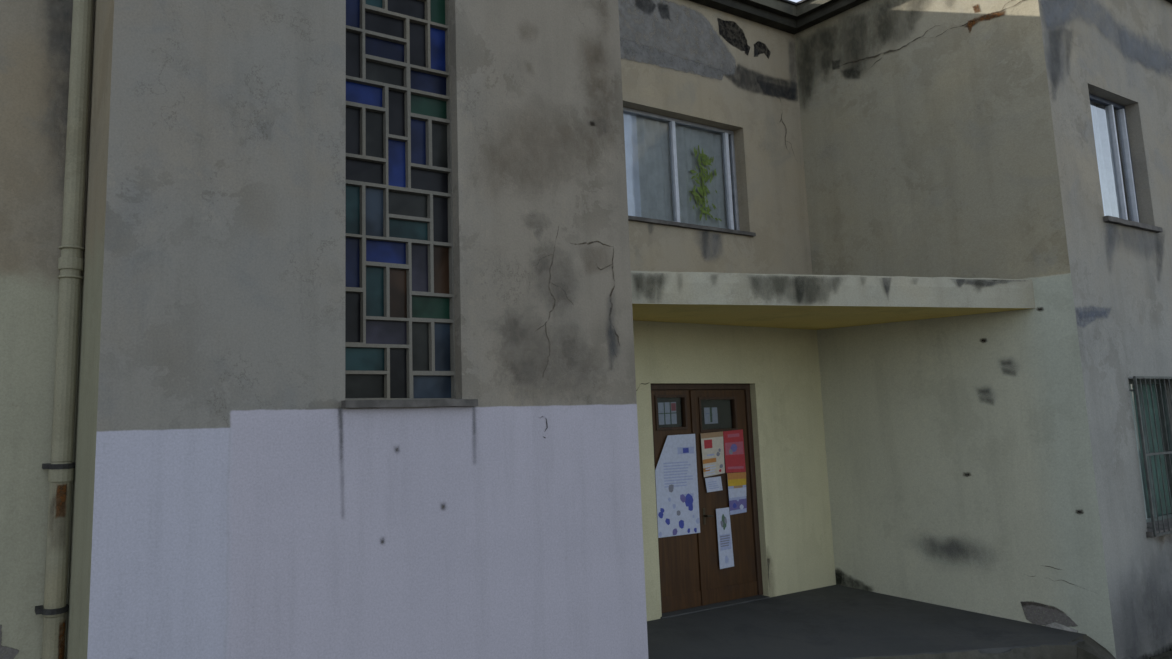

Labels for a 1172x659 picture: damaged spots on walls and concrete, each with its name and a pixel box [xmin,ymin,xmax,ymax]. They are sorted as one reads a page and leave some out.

peeling [618,0,770,80]
crack [843,0,1025,65]
crack [537,226,620,376]
corrosion [56,484,67,517]
peeling [0,625,19,659]
peeling [1021,602,1078,633]